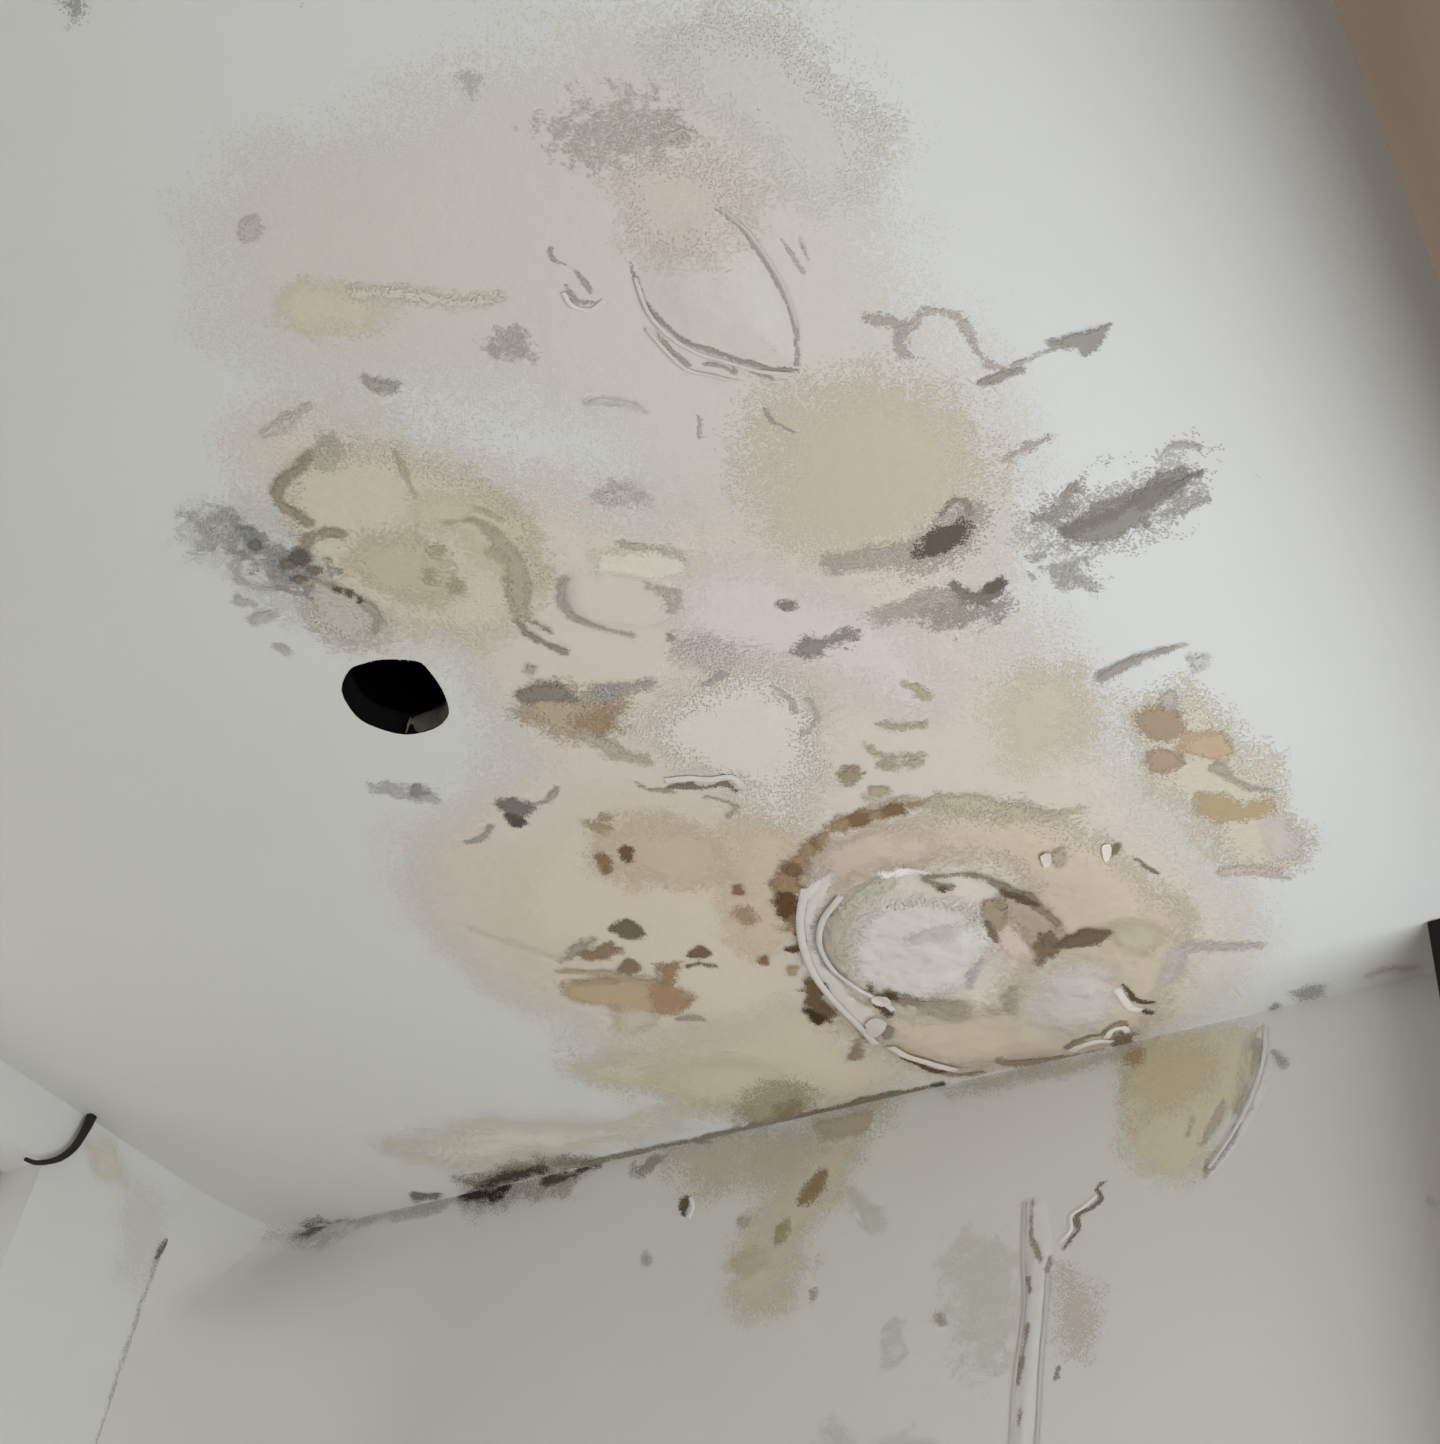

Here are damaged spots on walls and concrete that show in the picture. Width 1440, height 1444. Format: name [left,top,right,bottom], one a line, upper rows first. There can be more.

damp [157,0,1330,1332]
peeling [1040,853,1052,868]
peeling [1102,843,1112,862]
corrosion [553,960,702,1016]
peeling [796,866,1008,1073]
spalling [1030,931,1063,968]
peeling [1068,988,1144,1052]
damp [81,1135,178,1303]
crack [1016,1181,1107,1426]
damp [1042,1258,1119,1373]